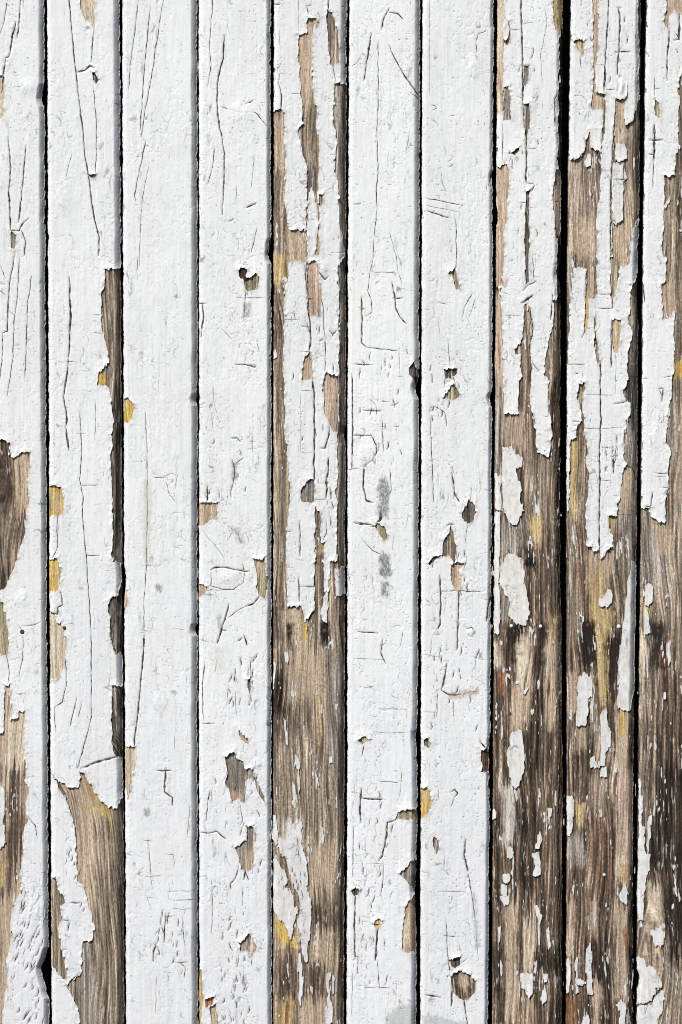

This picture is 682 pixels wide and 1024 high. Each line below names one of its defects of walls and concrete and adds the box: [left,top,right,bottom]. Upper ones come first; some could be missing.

crack [0,0,21,93]
crack [0,140,32,395]
crack [66,0,100,256]
crack [208,0,299,253]
crack [284,8,436,554]
peeling [0,439,31,656]
peeling [97,268,134,656]
peeling [225,9,360,1024]
peeling [481,0,682,1024]
peeling [0,684,29,1024]
peeling [51,685,136,1024]
crack [145,735,305,1022]